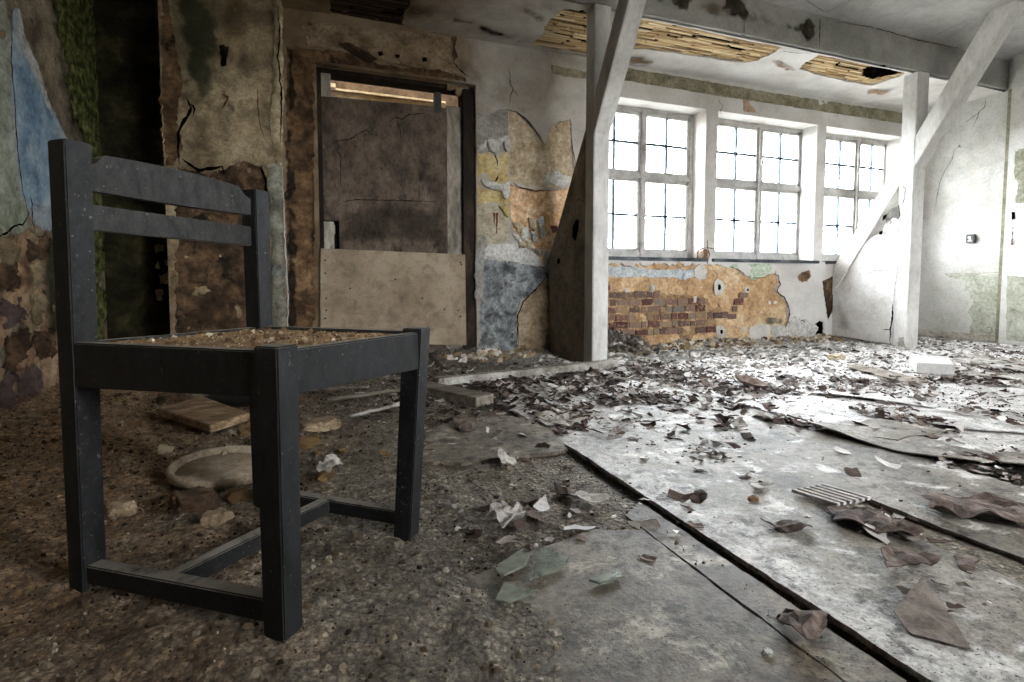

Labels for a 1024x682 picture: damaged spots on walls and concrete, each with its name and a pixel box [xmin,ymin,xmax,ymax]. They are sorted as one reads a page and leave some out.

spalling [532,0,589,53]
spalling [633,19,789,62]
spalling [801,51,913,84]
spalling [0,0,67,409]
crack [177,99,225,175]
crack [260,166,268,191]
crack [334,113,438,204]
spalling [474,109,576,299]
spalling [879,205,900,235]
spalling [607,262,833,345]